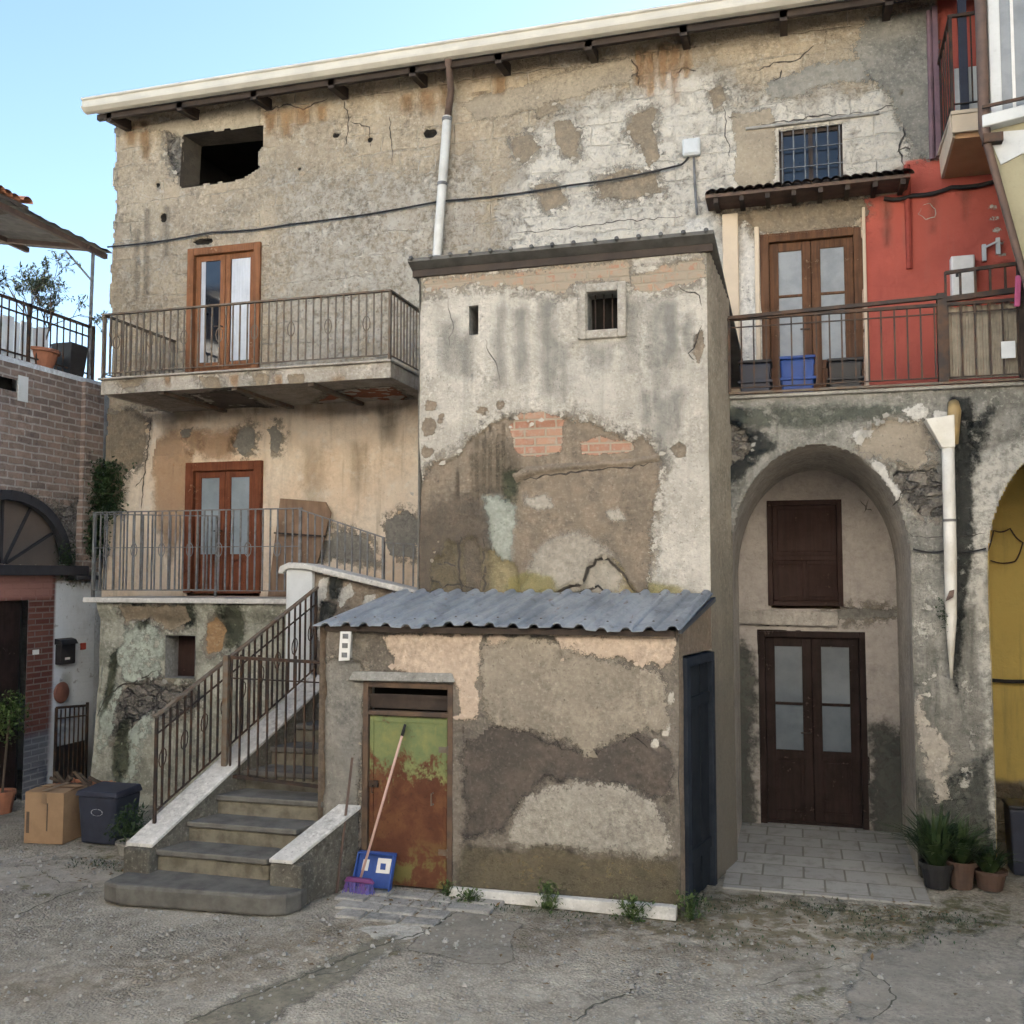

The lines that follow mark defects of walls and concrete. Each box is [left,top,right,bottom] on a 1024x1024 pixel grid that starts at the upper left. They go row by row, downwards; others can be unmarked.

crack [757,45,814,80]
crack [264,98,393,157]
flaking render [507,96,585,166]
flaking render [589,103,669,207]
crack [723,105,910,163]
flaking render [531,175,569,215]
spalling [181,370,289,460]
damp [730,405,902,482]
flaking render [318,400,686,593]
damp [100,649,118,716]
damp [112,717,130,782]
flaking render [914,694,957,804]